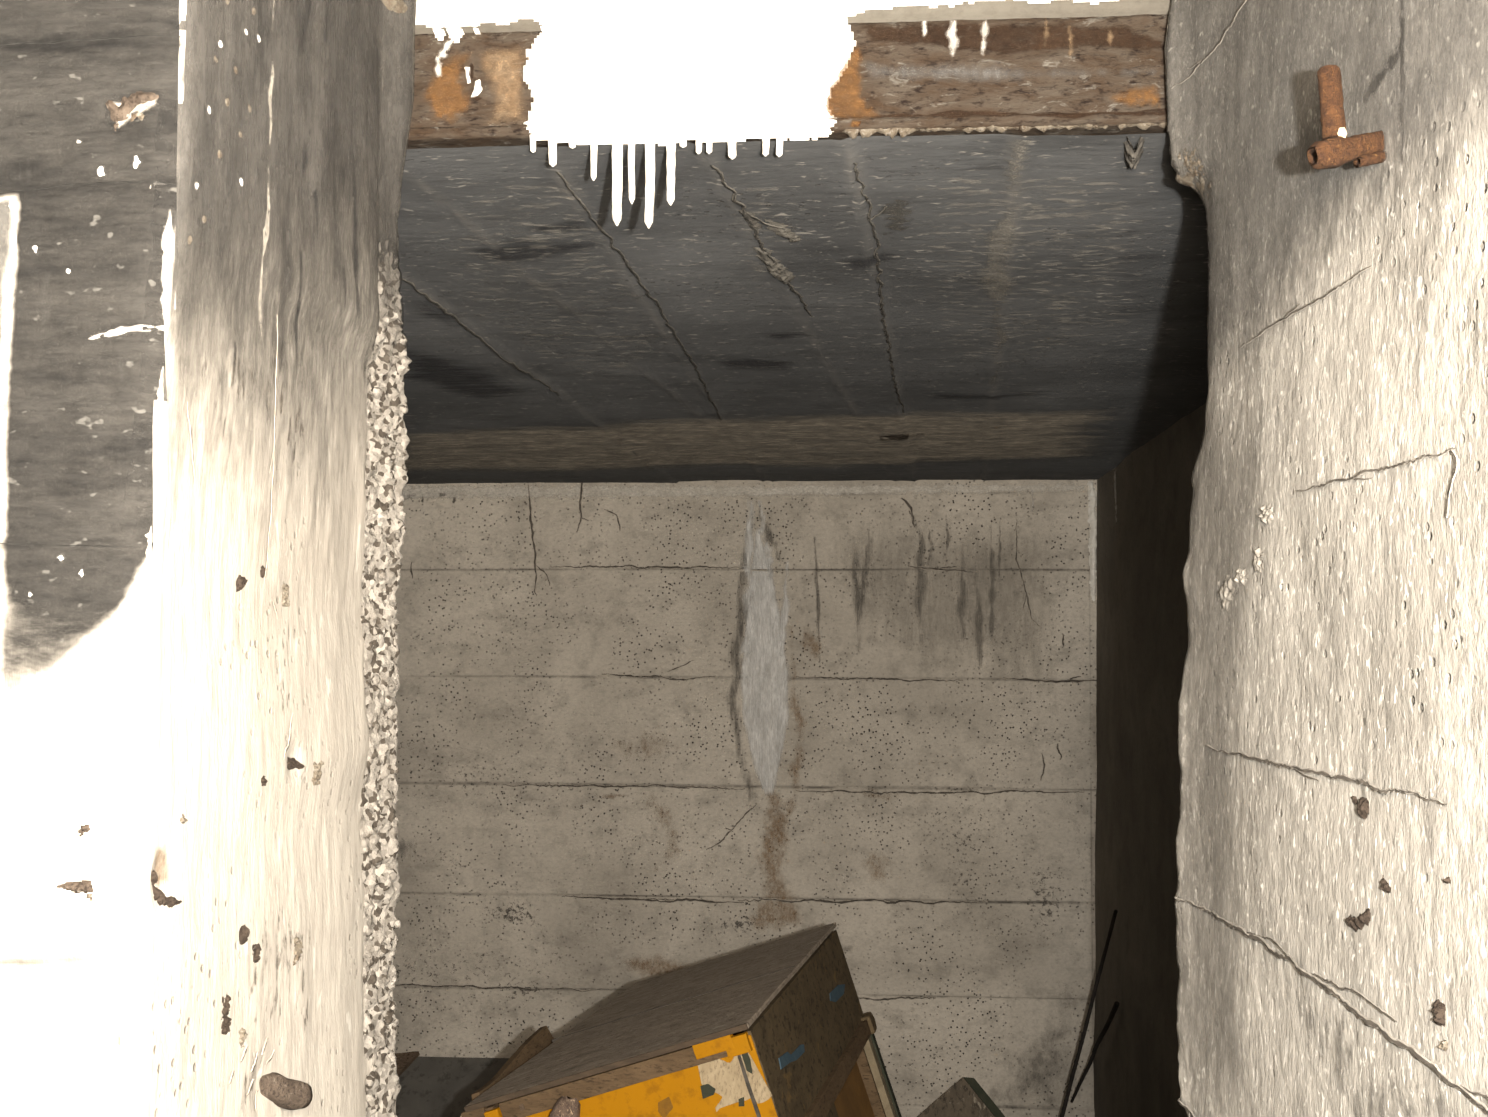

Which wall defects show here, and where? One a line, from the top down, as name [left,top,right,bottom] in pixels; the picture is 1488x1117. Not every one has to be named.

spalling [464,64,482,100]
crack [556,172,722,421]
crack [711,165,812,317]
crack [854,163,904,413]
crack [1296,447,1458,518]
crack [527,483,739,596]
crack [1206,745,1447,806]
crack [1174,897,1488,1114]
crack [1177,1098,1195,1117]